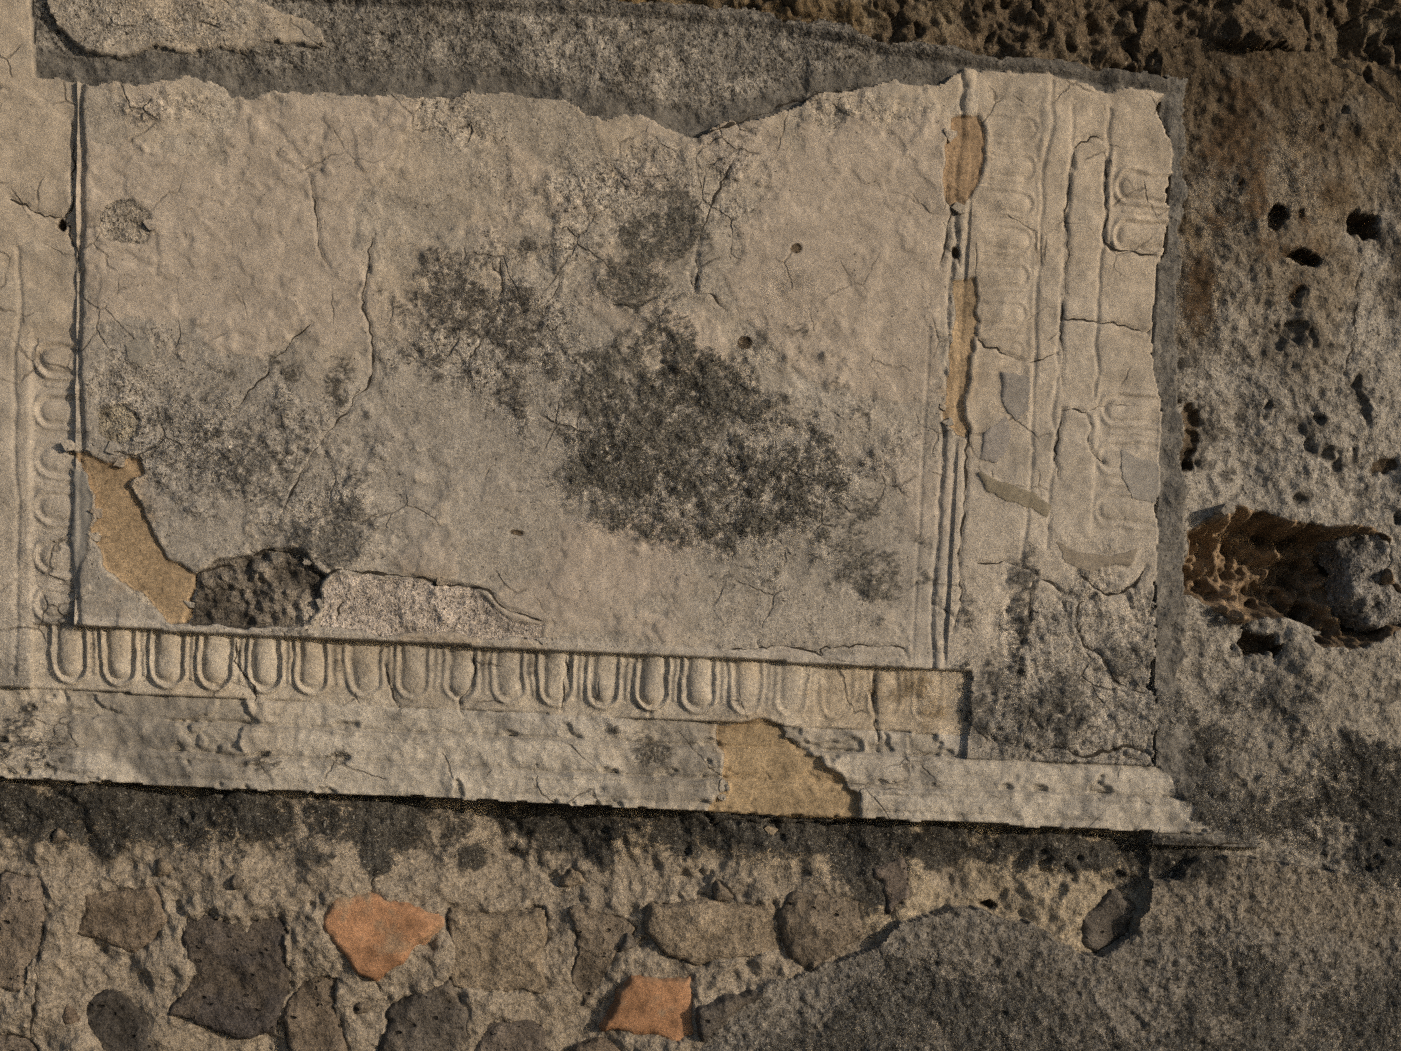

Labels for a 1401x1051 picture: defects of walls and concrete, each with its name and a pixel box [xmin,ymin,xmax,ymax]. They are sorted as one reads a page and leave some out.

crack [11,126,79,257]
spalling [61,405,550,644]
crack [200,236,552,624]
leakage [381,181,941,625]
leakage [0,672,1401,935]
peeling [706,718,860,835]
crack [726,640,906,750]
peeling [939,277,978,437]
peeling [943,115,985,214]
crack [934,432,1147,694]
crack [976,135,1157,472]
spalling [1182,503,1401,650]